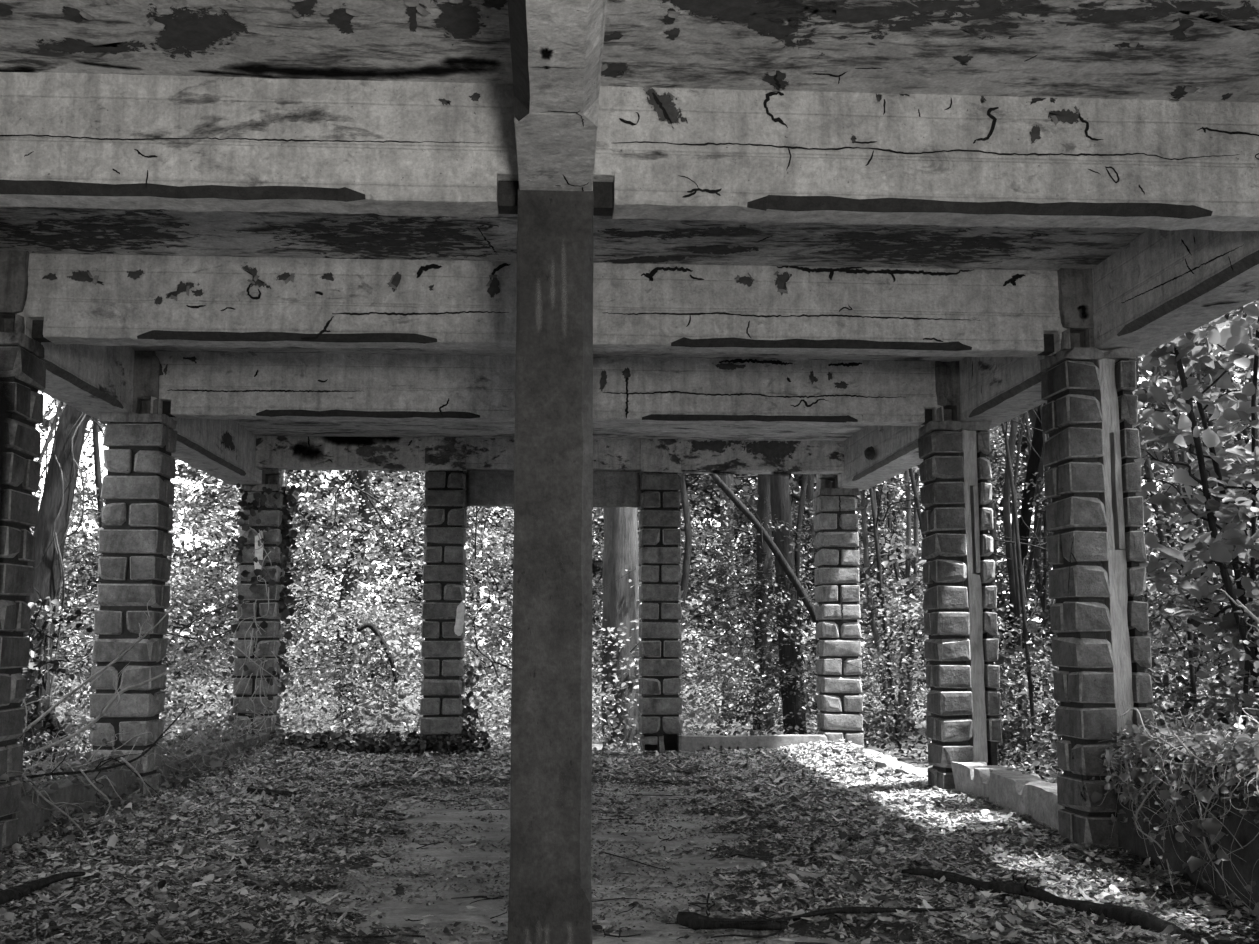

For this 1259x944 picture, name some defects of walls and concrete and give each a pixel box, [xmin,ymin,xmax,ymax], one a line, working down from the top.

crack [813,68,883,84]
crack [618,92,1259,194]
crack [678,175,722,226]
crack [417,264,442,278]
crack [1003,274,1026,286]
crack [301,291,509,340]
crack [602,236,980,418]